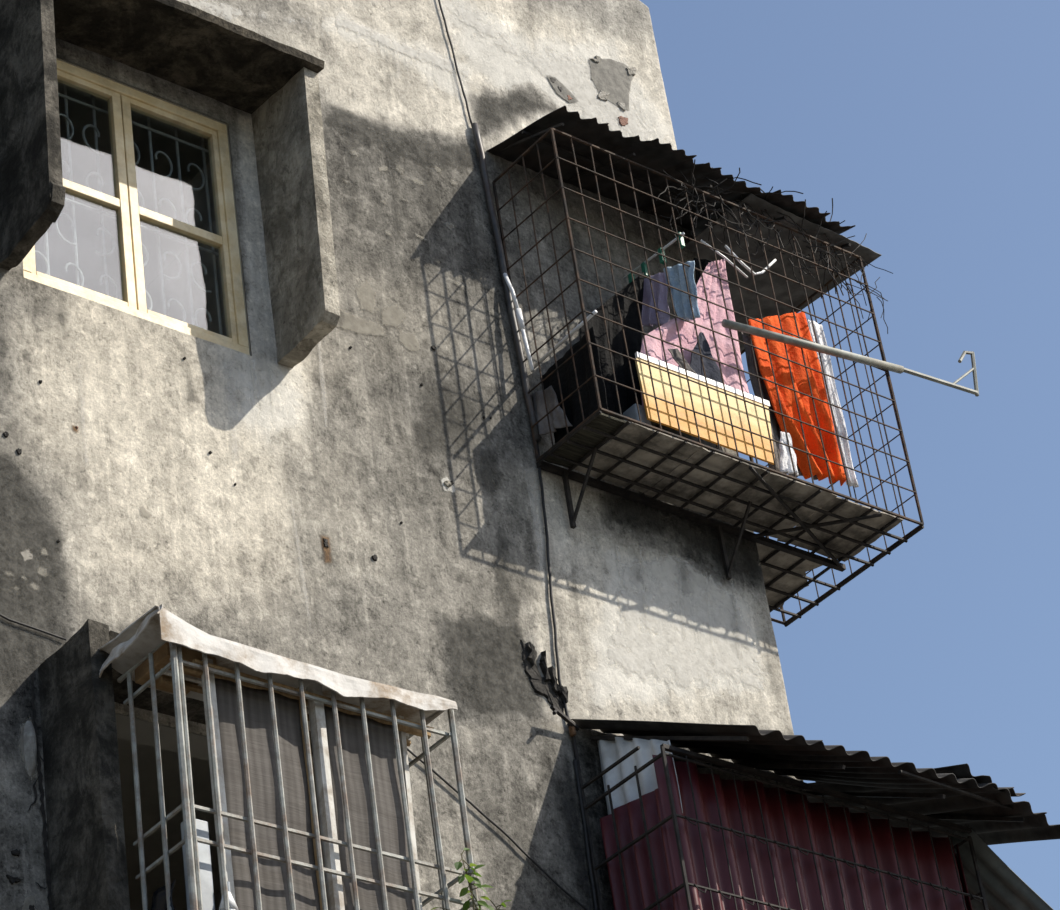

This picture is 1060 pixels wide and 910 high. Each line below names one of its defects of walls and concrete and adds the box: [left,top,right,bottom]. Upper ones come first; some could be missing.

spalling [547,75,578,103]
spalling [589,55,636,126]
peeling [525,642,568,703]